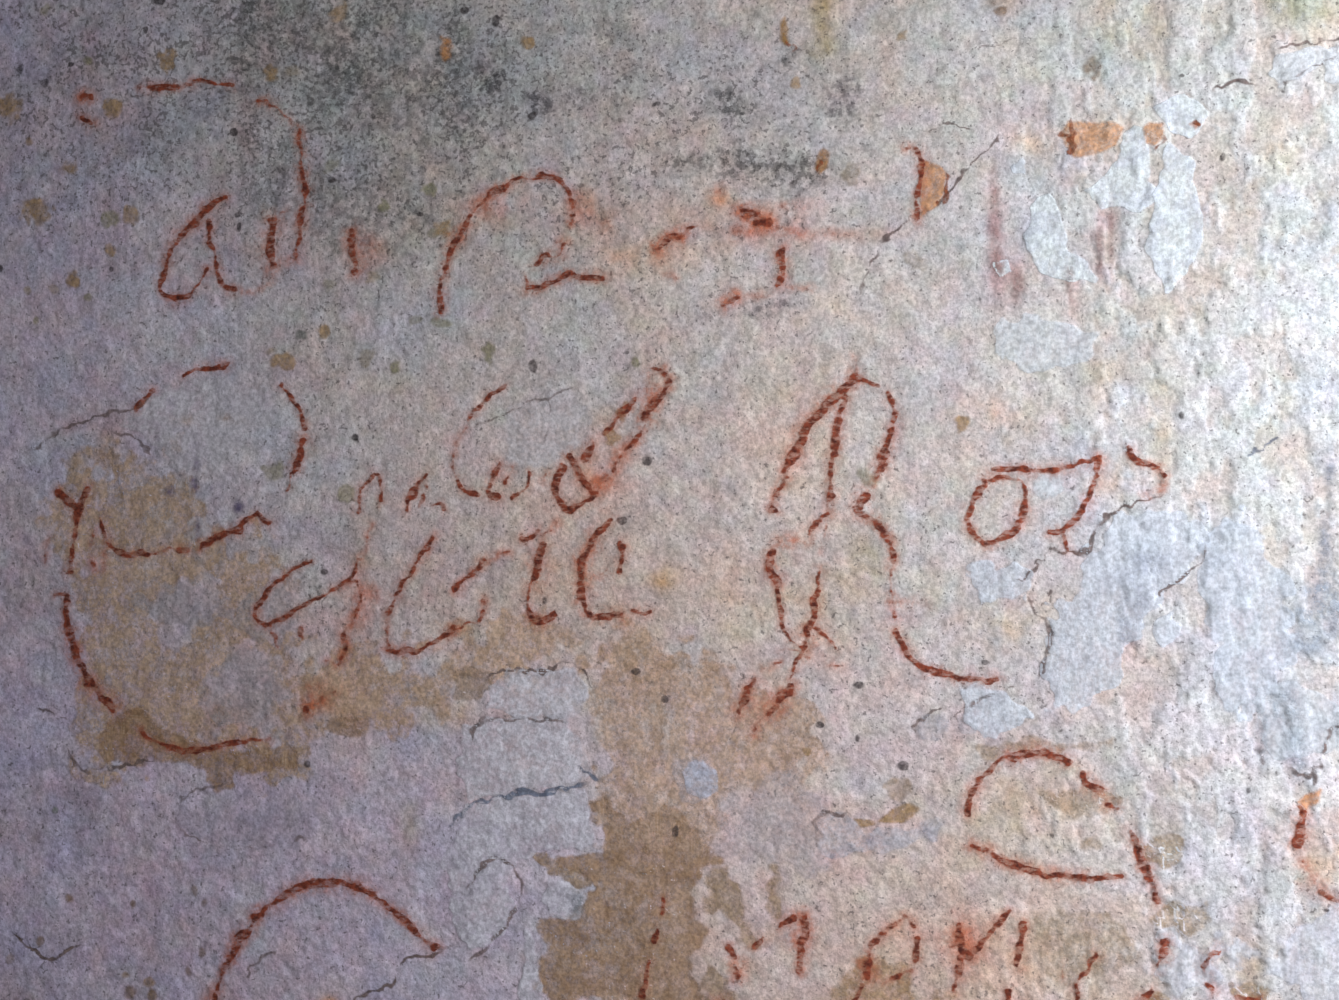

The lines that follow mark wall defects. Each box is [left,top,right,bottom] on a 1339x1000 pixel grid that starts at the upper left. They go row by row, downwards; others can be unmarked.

flaking render [1085,94,1209,293]
flaking render [993,259,1011,276]
flaking render [1024,194,1097,283]
crack [454,766,598,820]